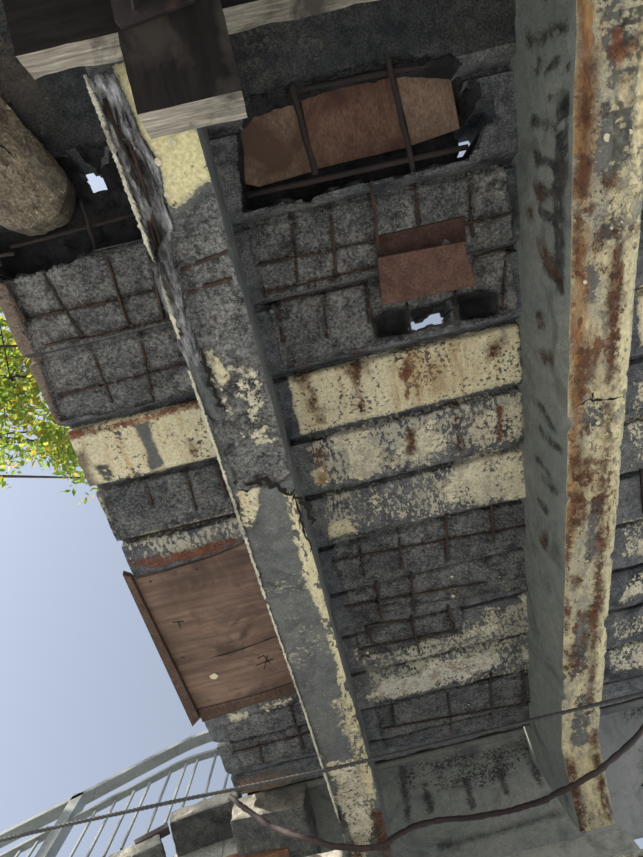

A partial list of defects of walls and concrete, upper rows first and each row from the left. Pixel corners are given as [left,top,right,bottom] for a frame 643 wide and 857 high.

water stain [530,93,569,294]
spalling [0,62,377,857]
rust [345,353,369,385]
spalling [236,49,531,748]
rust [399,360,412,399]
rust [486,339,505,357]
rust [563,0,637,714]
peeling [570,0,643,747]
rust [565,759,587,832]
rust [590,729,612,819]